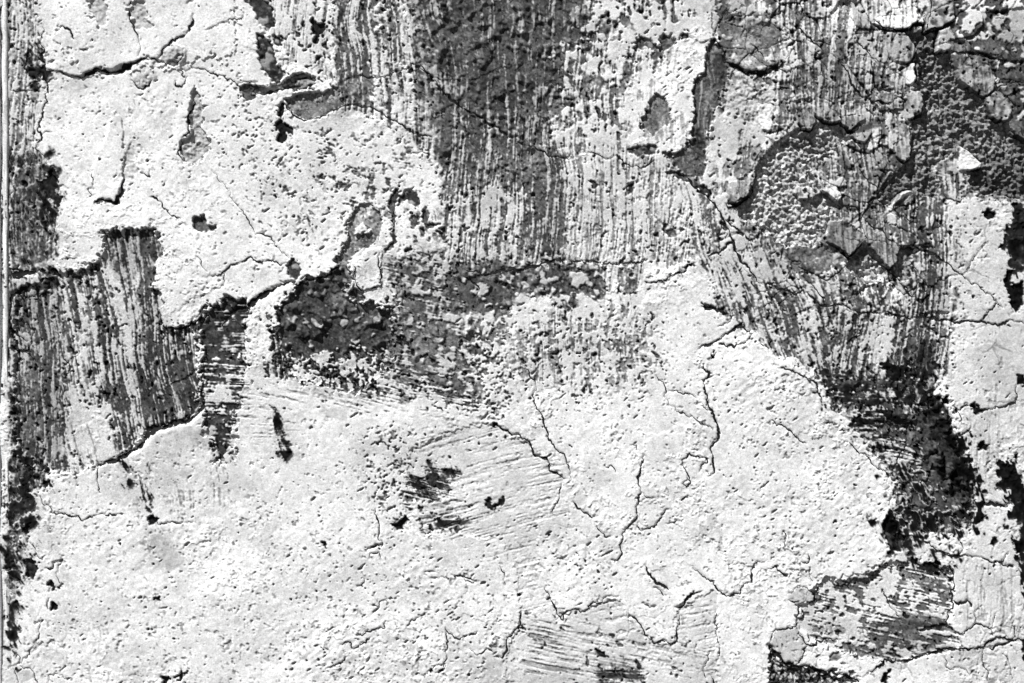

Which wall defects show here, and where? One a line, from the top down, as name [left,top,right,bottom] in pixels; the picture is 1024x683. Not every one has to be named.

crack [12,1,256,164]
peeling [632,33,678,52]
peeling [628,40,730,180]
spalling [871,0,1024,220]
crack [465,170,1023,326]
spalling [727,104,920,285]
peeling [12,203,402,480]
crack [495,304,907,561]
crack [544,588,615,620]
crack [631,532,1023,683]
peeling [794,557,968,683]